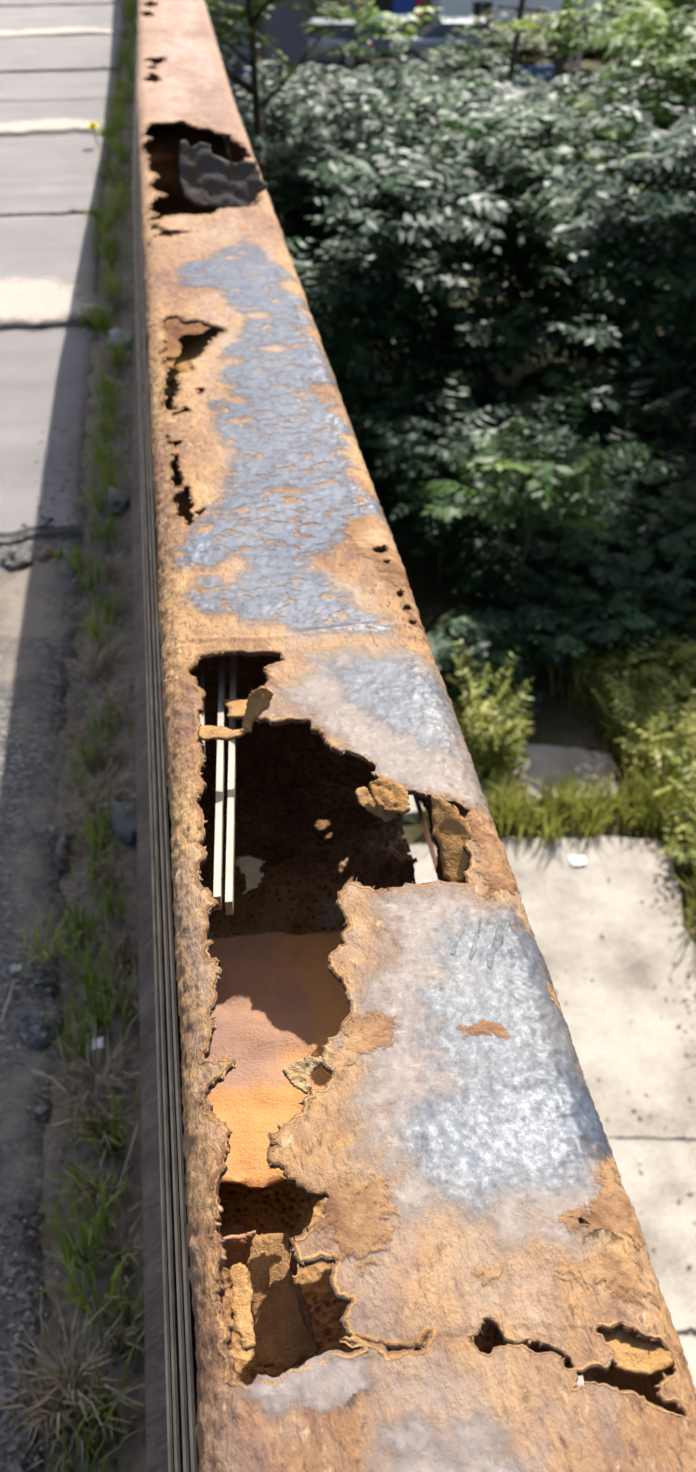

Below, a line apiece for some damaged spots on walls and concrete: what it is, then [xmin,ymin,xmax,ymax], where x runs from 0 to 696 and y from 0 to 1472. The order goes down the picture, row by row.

peeling [175,235,391,633]
corrosion [345,514,425,631]
spalling [394,589,419,626]
peeling [330,658,457,754]
spalling [413,795,440,880]
corrosion [278,646,668,1316]
corrosion [242,1351,372,1417]
crack [467,1317,577,1370]
corrosion [596,1327,675,1376]